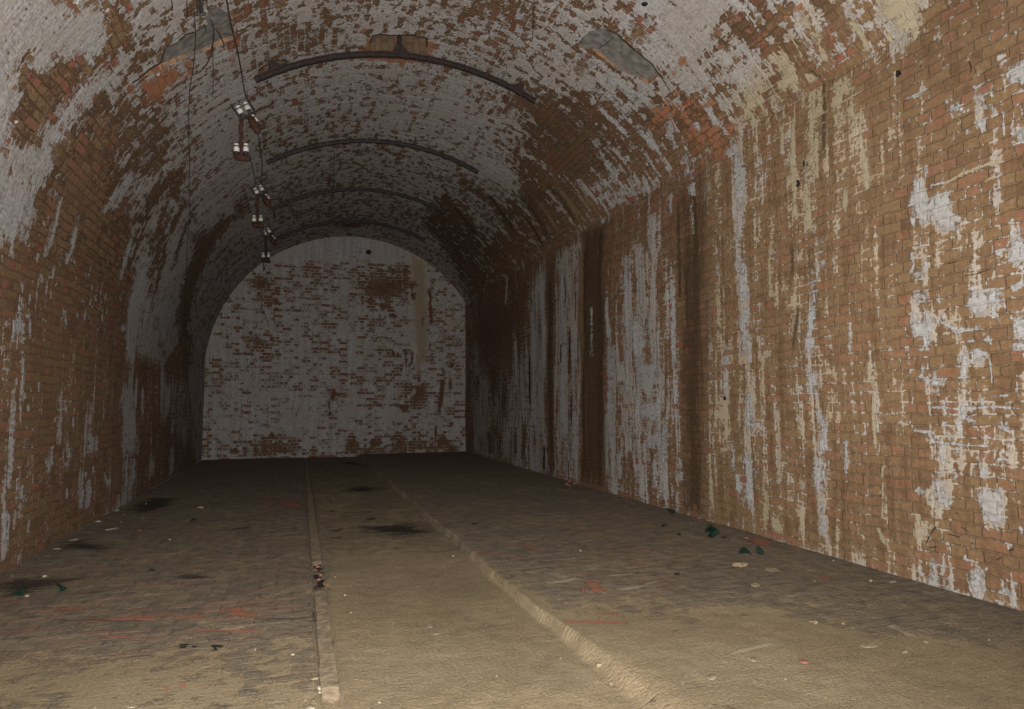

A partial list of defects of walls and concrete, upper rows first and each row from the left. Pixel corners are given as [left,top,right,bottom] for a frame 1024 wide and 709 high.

spalling [145,5,236,76]
spalling [370,33,428,55]
damp [474,184,618,486]